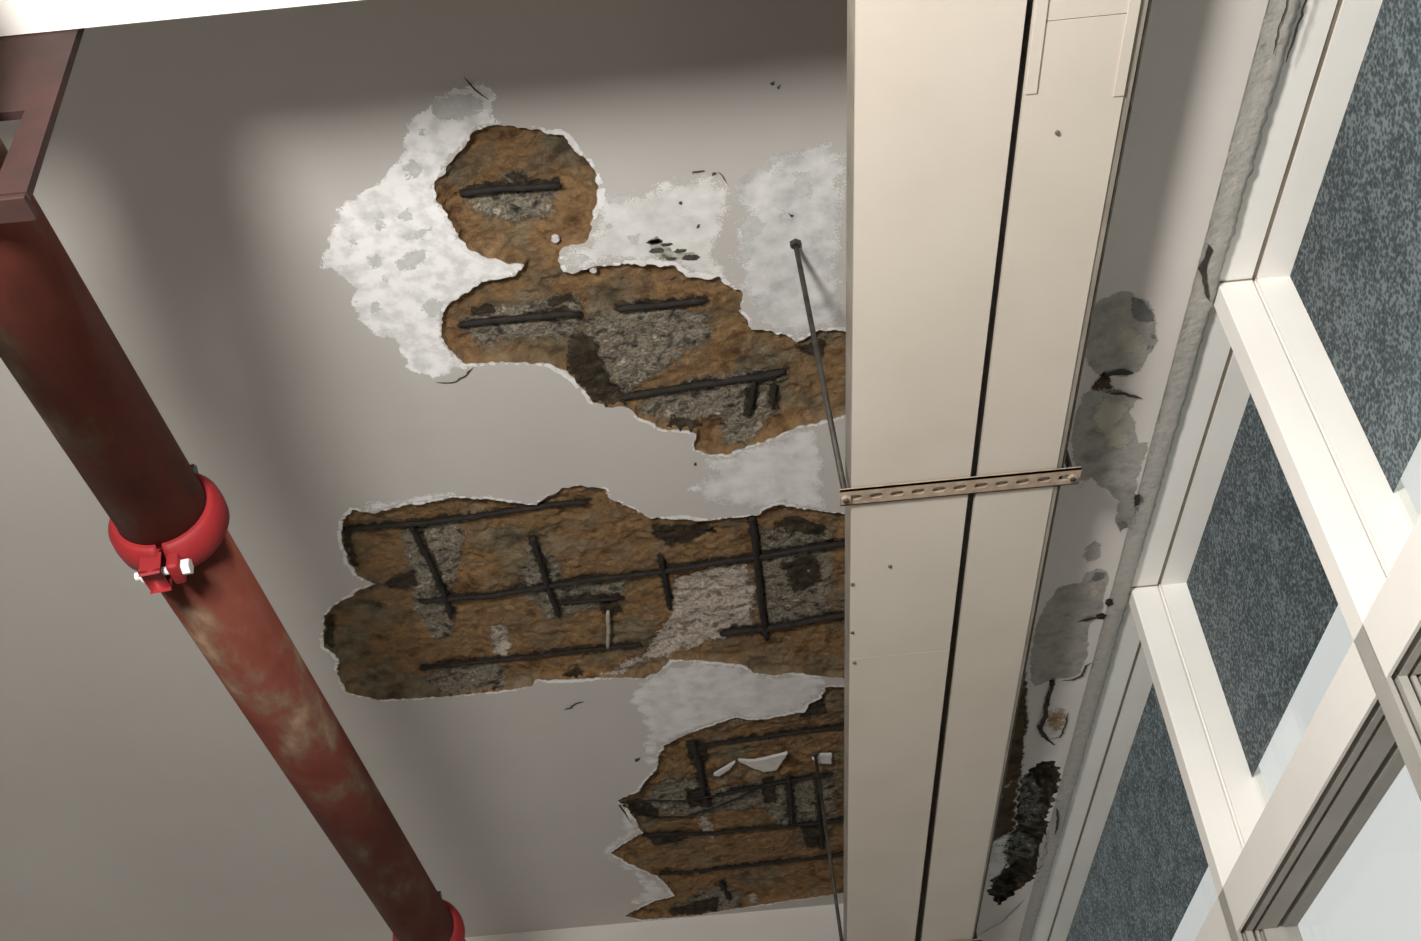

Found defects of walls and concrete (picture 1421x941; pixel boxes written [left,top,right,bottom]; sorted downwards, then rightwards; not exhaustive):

spalling [319,81,847,921]
peeling [1029,541,1114,687]
peeling [1071,291,1159,532]